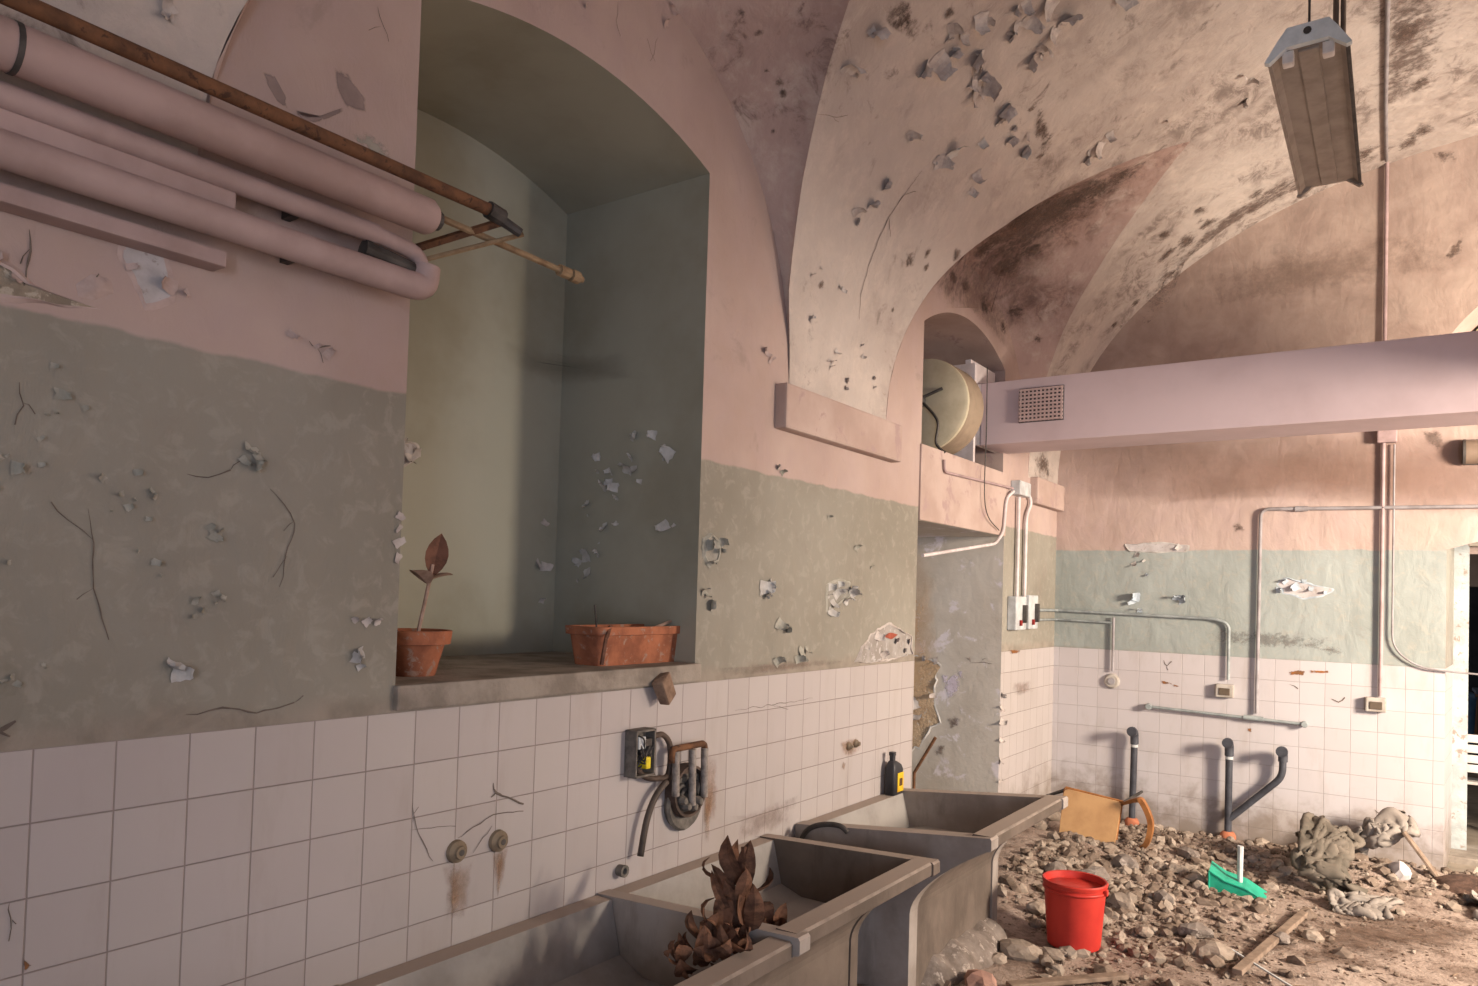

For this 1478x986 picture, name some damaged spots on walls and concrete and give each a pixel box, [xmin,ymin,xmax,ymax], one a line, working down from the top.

peeling [916,0,1083,171]
peeling [1239,75,1259,109]
damp [1375,0,1437,103]
peeling [0,251,102,310]
peeling [117,245,191,311]
damp [951,172,1135,330]
crack [51,502,109,640]
crack [188,461,240,478]
crack [273,492,295,587]
peeling [572,430,676,583]
peeling [825,579,862,617]
peeling [854,622,942,752]